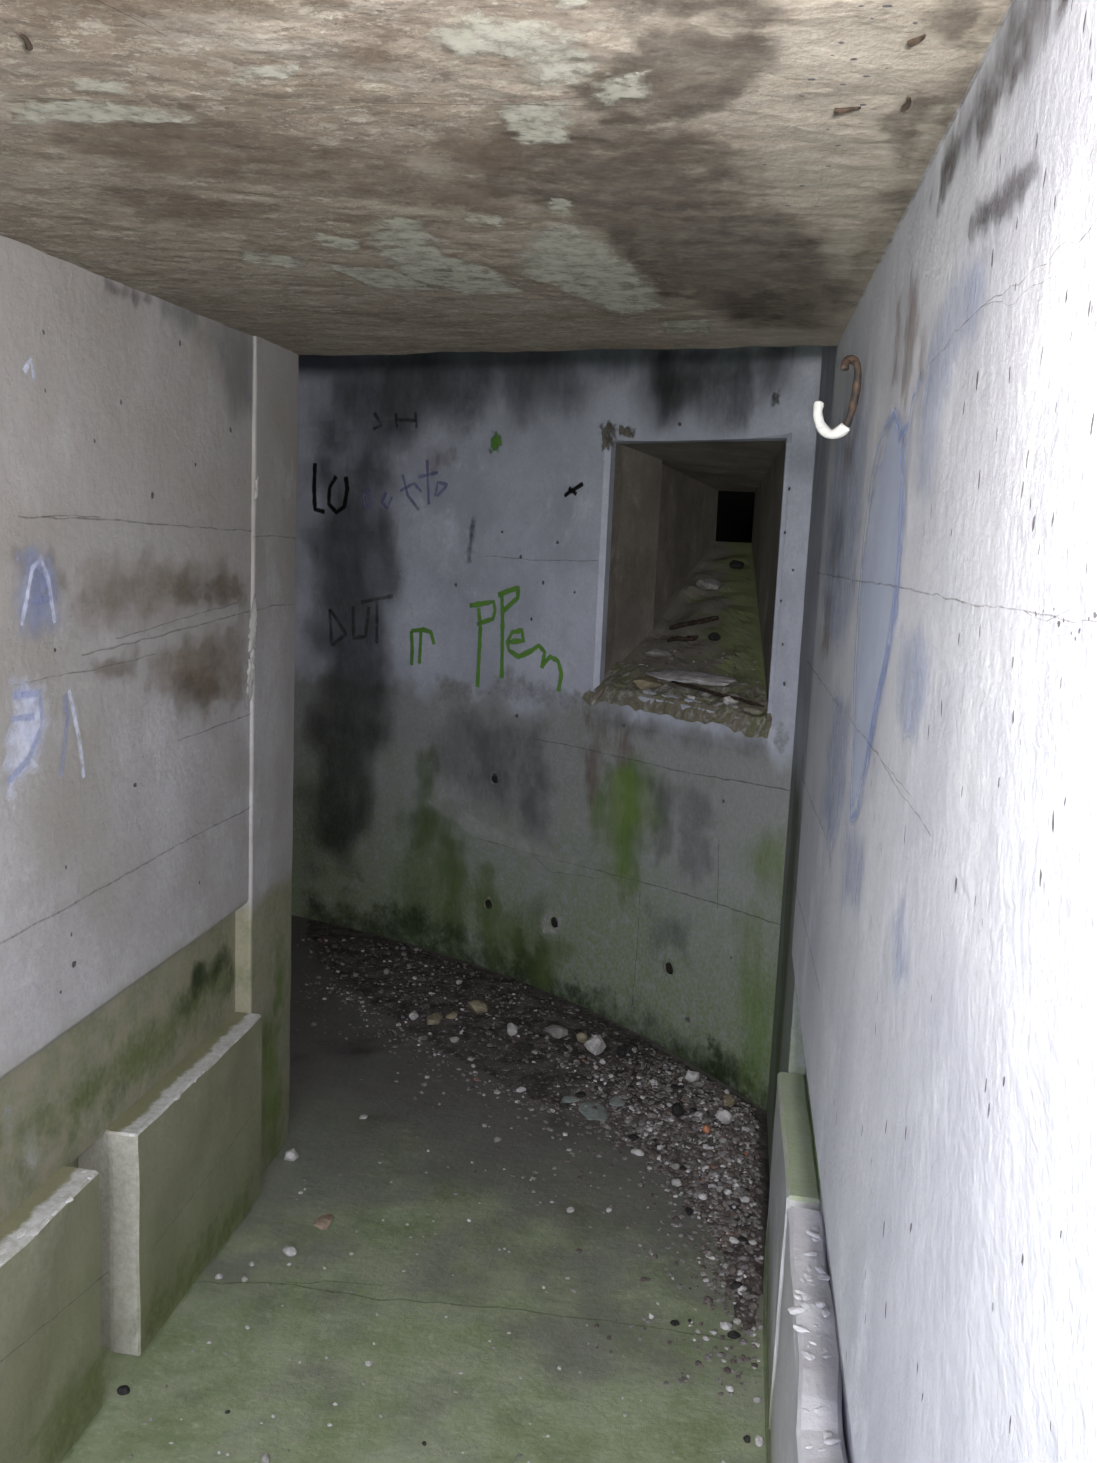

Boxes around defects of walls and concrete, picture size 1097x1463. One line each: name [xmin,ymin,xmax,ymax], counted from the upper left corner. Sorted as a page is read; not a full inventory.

water stain [883,0,1066,211]
water stain [434,0,841,328]
water stain [969,159,1038,237]
water stain [343,358,489,436]
water stain [657,363,746,416]
water stain [314,472,391,851]
spalling [582,662,772,738]